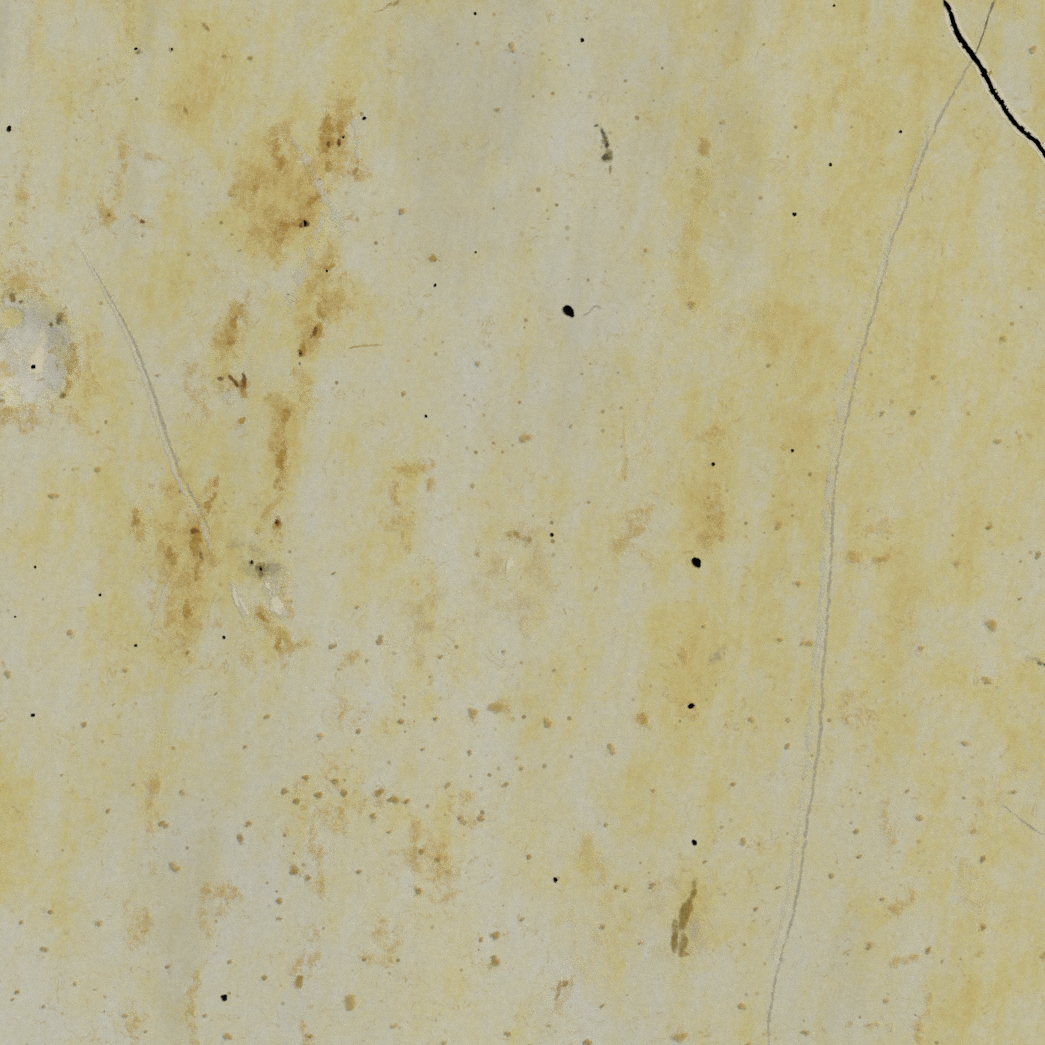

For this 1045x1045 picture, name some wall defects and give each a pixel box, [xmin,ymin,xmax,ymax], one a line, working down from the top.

corrosion [231,98,363,262]
crack [768,0,1045,1045]